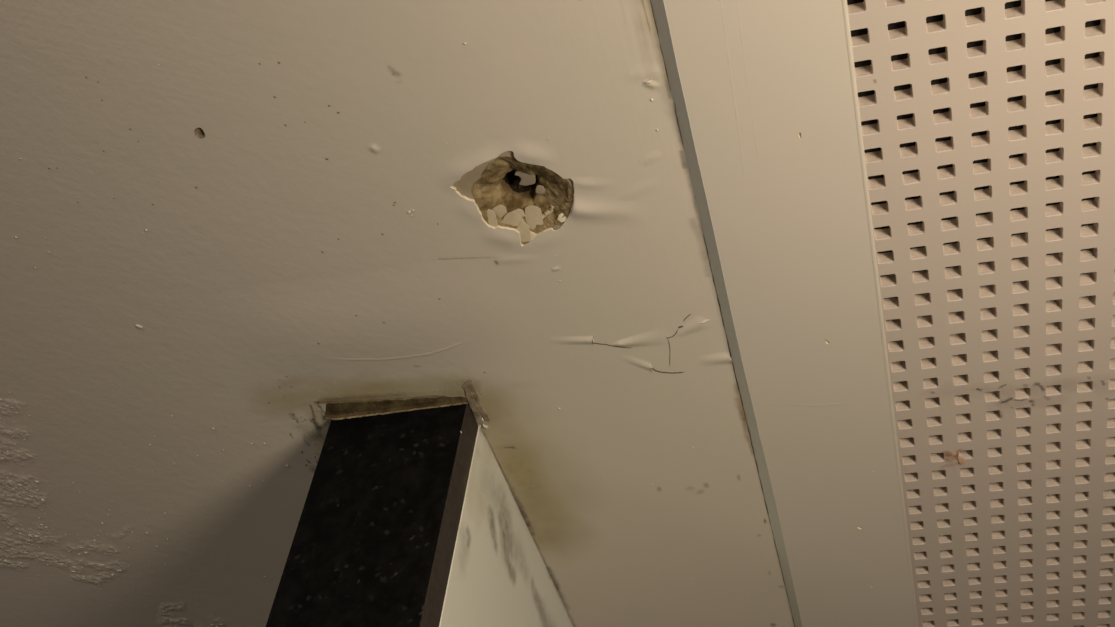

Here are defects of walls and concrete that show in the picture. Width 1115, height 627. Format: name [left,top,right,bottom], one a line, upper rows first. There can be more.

crack [650,0,684,147]
hole [428,137,597,255]
crack [650,314,691,374]
crack [703,235,795,627]